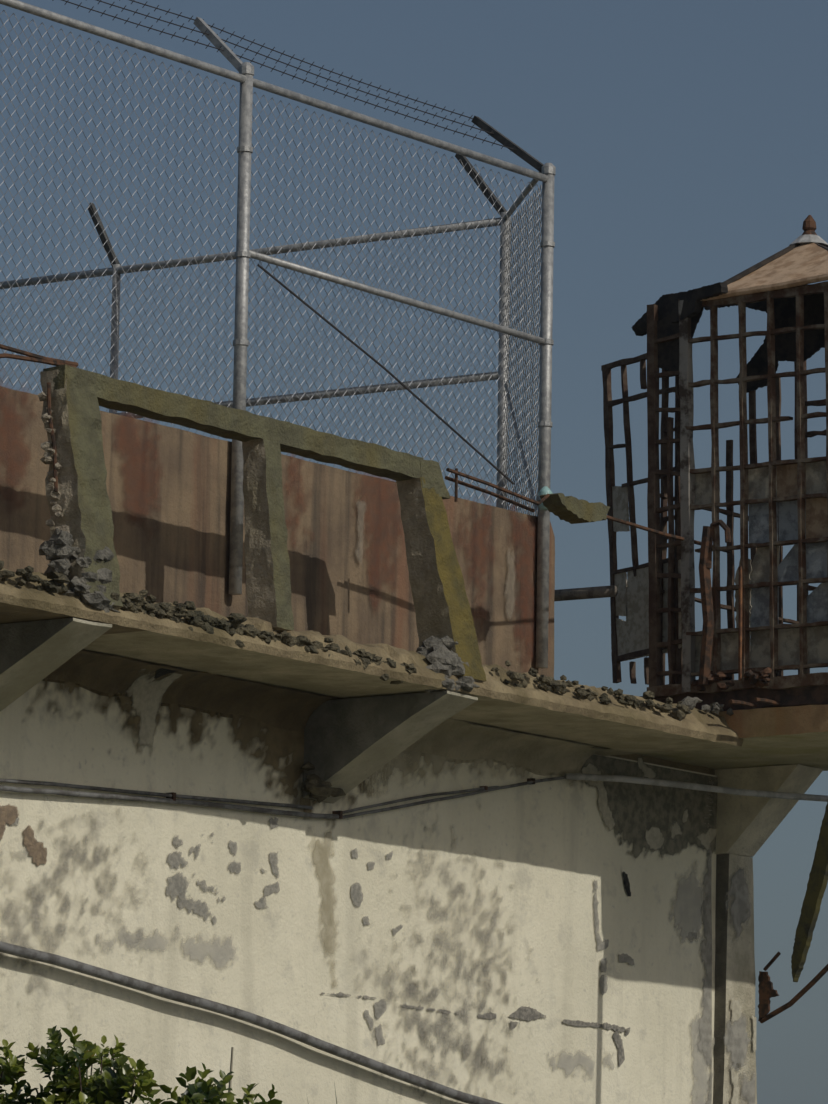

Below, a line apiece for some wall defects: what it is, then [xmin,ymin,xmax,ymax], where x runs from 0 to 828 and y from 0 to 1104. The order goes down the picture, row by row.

spalling [0,344,78,368]
spalling [0,382,480,694]
peeling [0,805,47,866]
peeling [166,836,225,924]
peeling [228,840,241,874]
peeling [255,853,280,909]
peeling [96,929,236,968]
peeling [550,1052,614,1077]